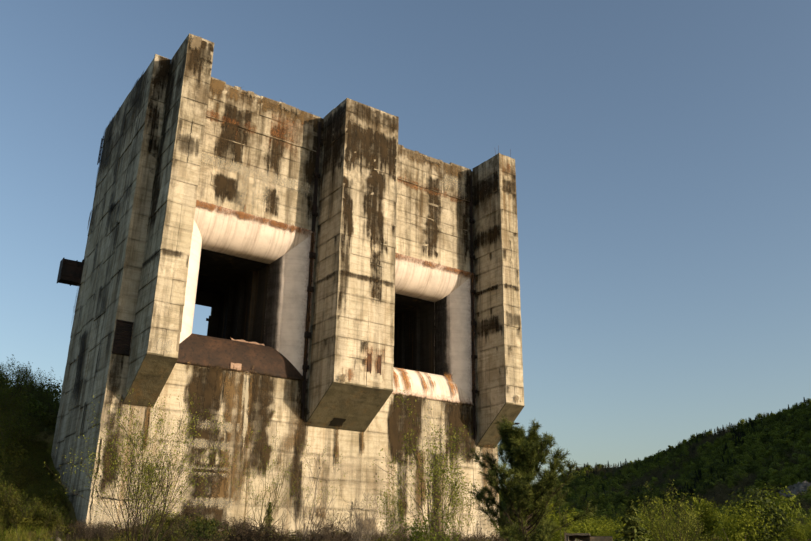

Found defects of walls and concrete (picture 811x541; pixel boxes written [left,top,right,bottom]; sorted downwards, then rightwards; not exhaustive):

water stain [180,40,519,318]
corrosion [196,200,305,234]
water stain [68,56,181,491]
water stain [143,248,189,266]
water stain [474,308,521,338]
corrosion [393,368,436,390]
water stain [180,362,325,524]
water stain [388,391,498,536]
water stain [89,502,169,533]